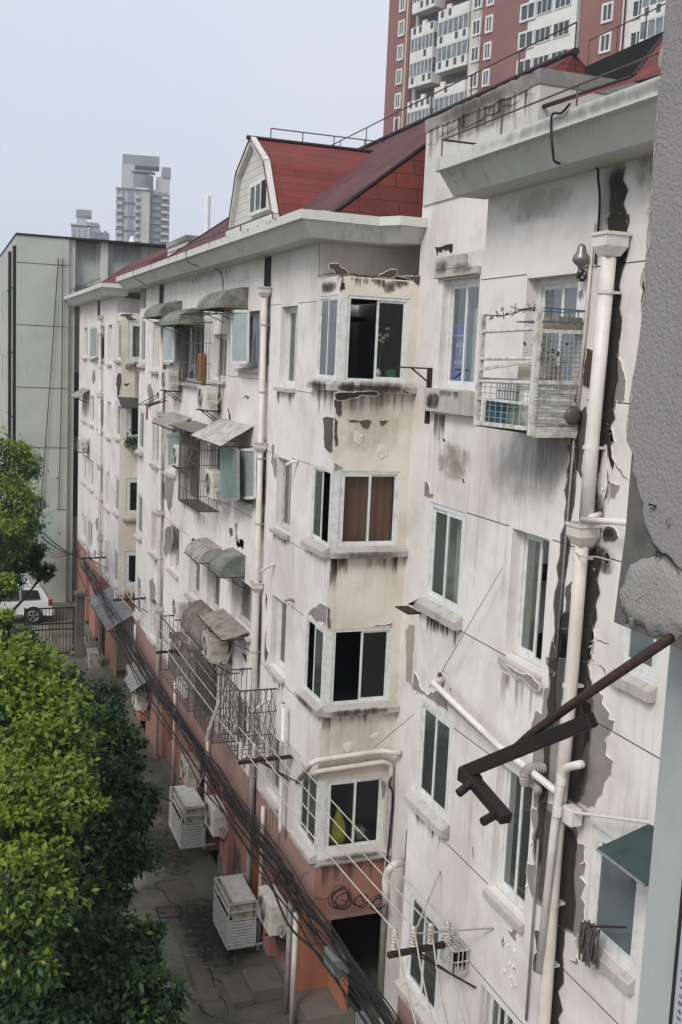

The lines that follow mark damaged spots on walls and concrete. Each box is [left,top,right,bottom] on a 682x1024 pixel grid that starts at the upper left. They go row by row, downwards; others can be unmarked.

peeling [322,391,389,471]
water stain [339,382,401,394]
peeling [566,406,588,480]
peeling [582,348,593,389]
peeling [596,318,634,499]
peeling [590,525,620,569]
peeling [308,603,332,628]
peeling [506,580,572,732]
peeling [582,614,596,678]
peeling [578,692,616,808]